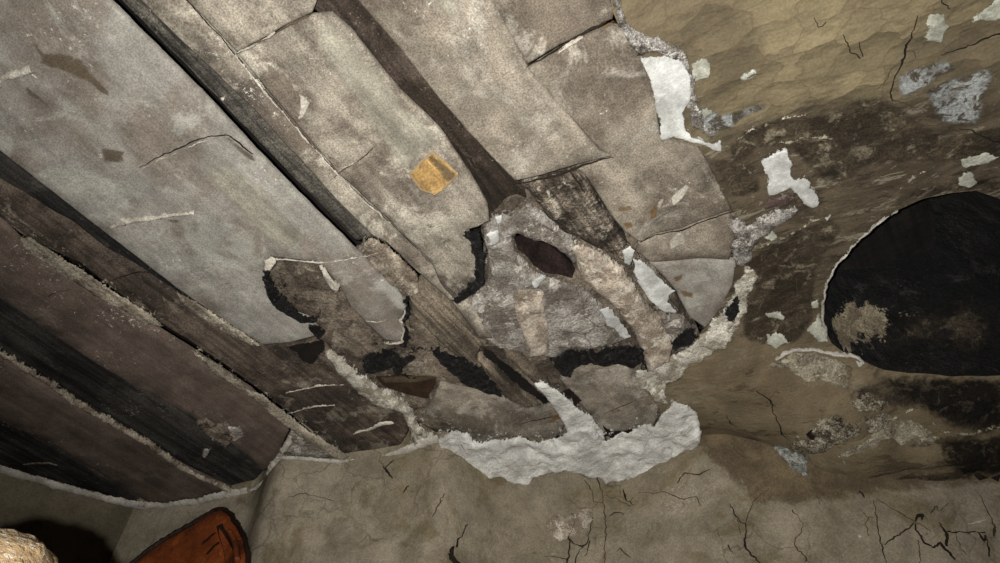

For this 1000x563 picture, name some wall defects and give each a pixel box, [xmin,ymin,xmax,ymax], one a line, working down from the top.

crack [868,15,931,114]
crack [138,134,254,171]
crack [186,0,428,261]
spalling [612,0,1000,389]
peeling [485,215,503,246]
peeling [531,271,546,288]
peeling [308,324,325,338]
peeling [600,307,631,339]
leakage [699,434,1000,504]
crack [448,525,467,563]
crack [552,470,708,563]
crack [859,490,996,563]